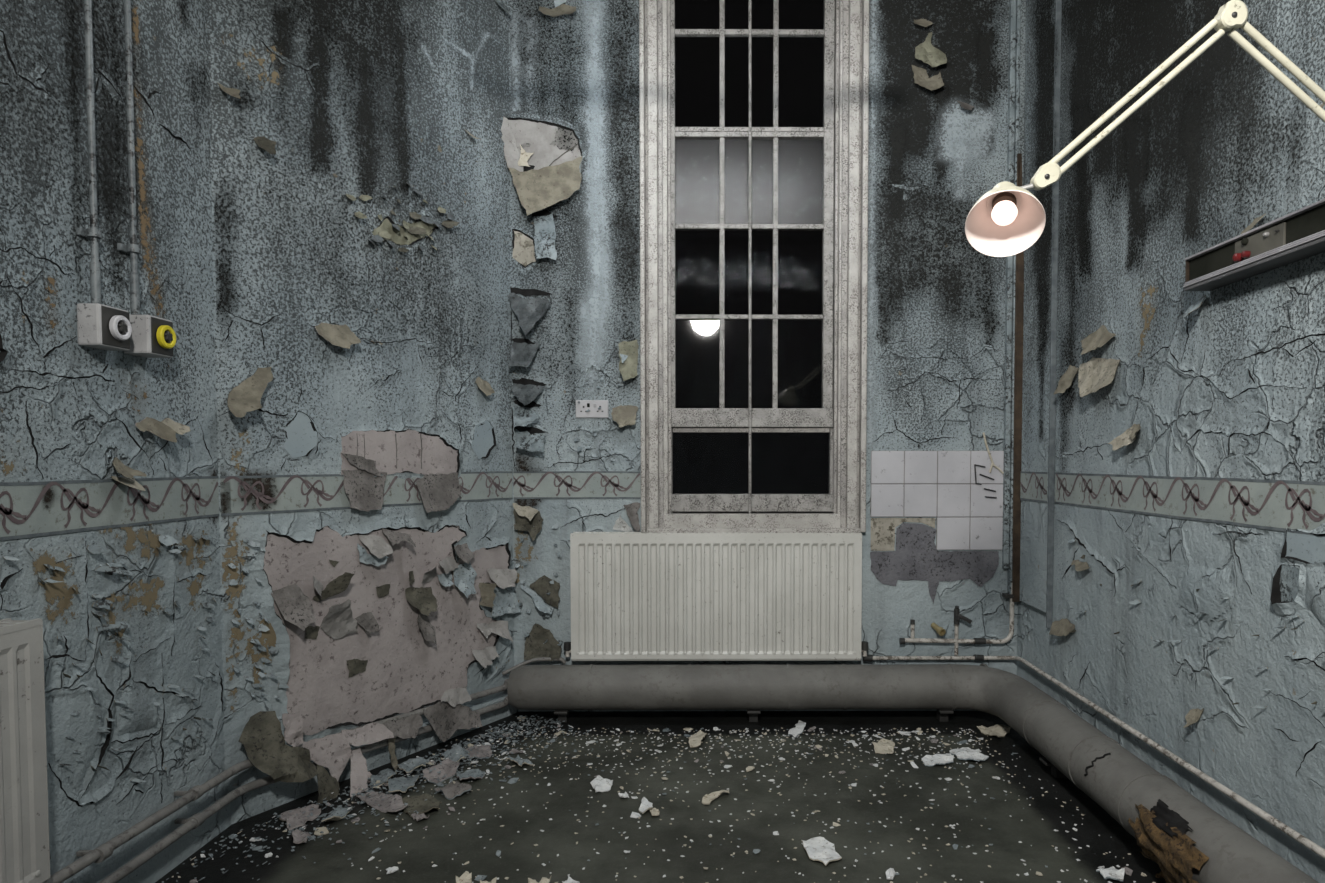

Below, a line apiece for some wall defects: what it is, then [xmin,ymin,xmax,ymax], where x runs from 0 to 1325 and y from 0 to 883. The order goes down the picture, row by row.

peeling [0,313,15,388]
crack [0,541,225,815]
crack [0,215,335,479]
flaking render [3,110,589,781]
damp [231,0,509,379]
damp [510,0,640,409]
peeling [870,518,999,604]
damp [866,0,1008,448]
crack [1056,510,1177,597]
damp [1031,0,1322,472]
crack [1120,302,1325,477]
peeling [1252,523,1325,636]